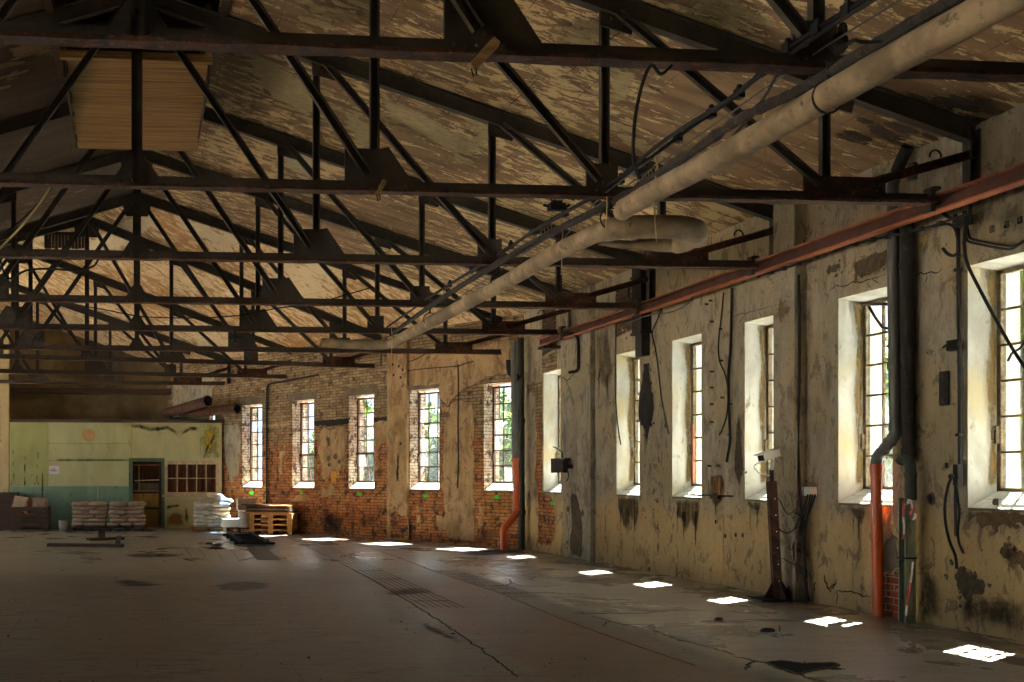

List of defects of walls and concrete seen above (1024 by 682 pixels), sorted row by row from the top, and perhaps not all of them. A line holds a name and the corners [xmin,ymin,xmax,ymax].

peeling [587,66,661,102]
peeling [234,53,398,154]
peeling [380,100,499,167]
peeling [598,122,677,165]
peeling [836,117,939,147]
peeling [270,146,326,180]
peeling [80,215,159,266]
peeling [176,215,238,251]
peeling [826,249,887,283]
leakage [618,498,639,530]
leakage [677,500,699,540]
leakage [964,597,1019,627]